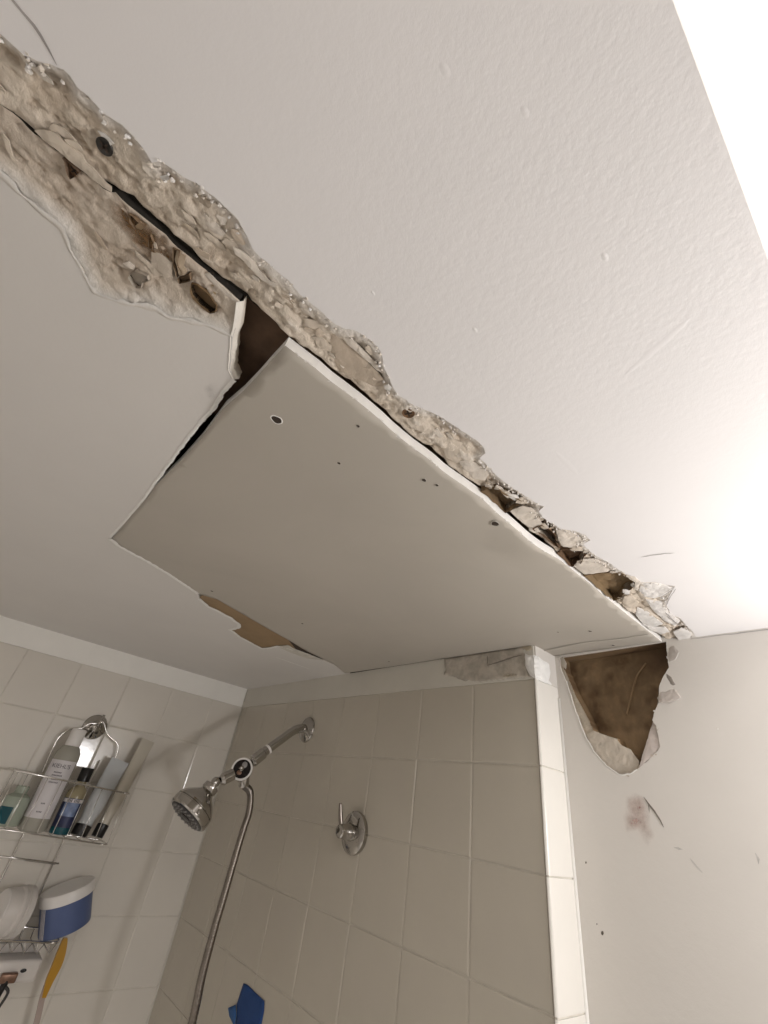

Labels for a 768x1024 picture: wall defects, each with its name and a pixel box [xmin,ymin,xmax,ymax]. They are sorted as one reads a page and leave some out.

flaking render [0,34,696,777]